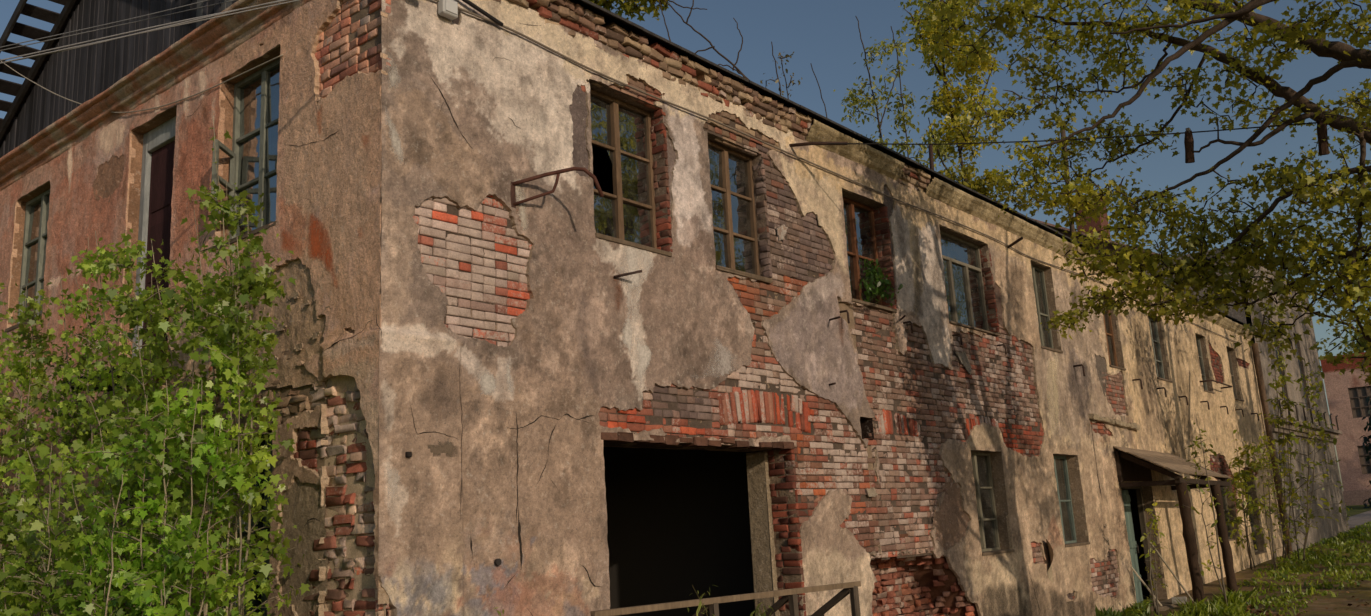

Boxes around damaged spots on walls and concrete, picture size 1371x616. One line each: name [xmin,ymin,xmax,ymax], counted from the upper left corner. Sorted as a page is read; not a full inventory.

flaking render [315,0,391,98]
flaking render [413,195,532,347]
flaking render [494,0,1044,616]
flaking render [163,259,392,616]
crack [505,414,595,587]
flaking render [1031,539,1054,582]
flaking render [1090,549,1119,598]
flaking render [1090,354,1127,436]